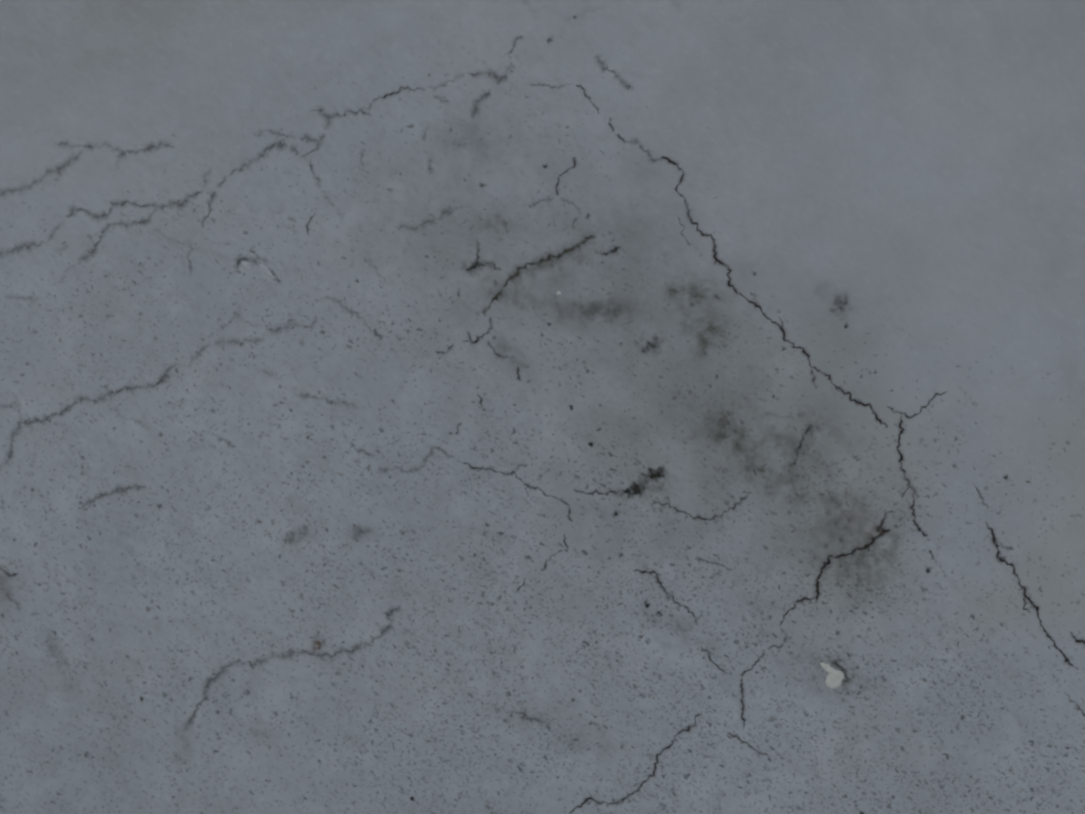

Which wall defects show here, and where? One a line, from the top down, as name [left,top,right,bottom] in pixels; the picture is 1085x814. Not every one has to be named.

crack [70,201,148,253]
crack [438,236,618,380]
crack [649,154,943,754]
crack [464,463,634,588]
crack [635,570,694,616]
crack [988,528,1085,666]
crack [570,714,702,813]